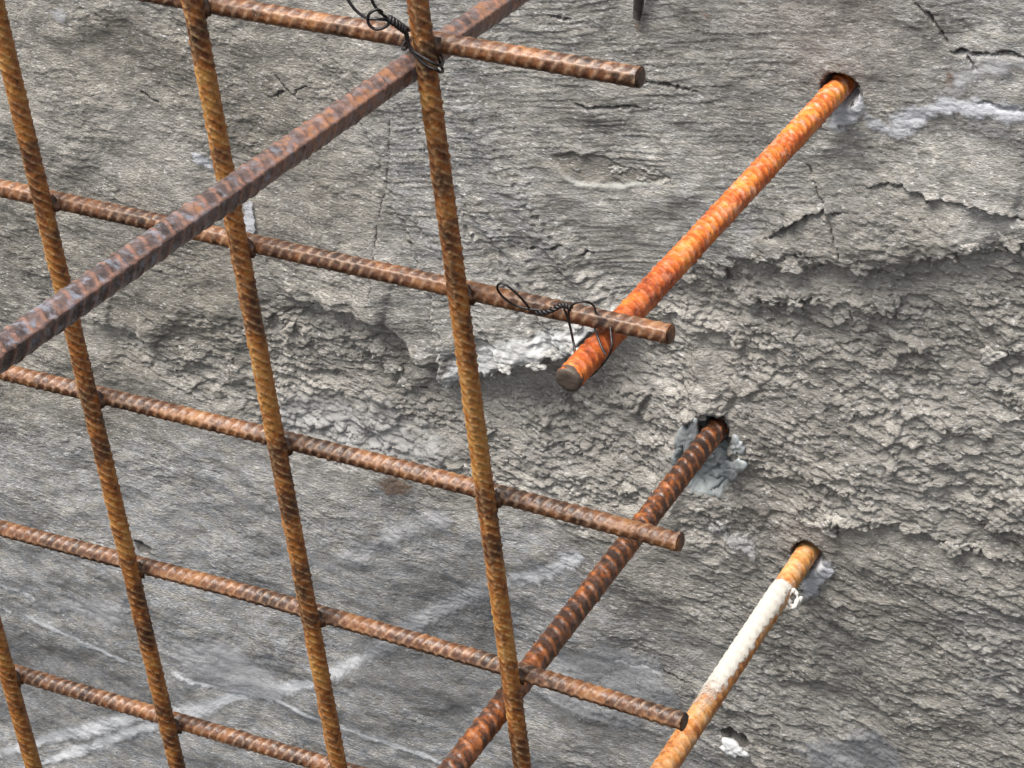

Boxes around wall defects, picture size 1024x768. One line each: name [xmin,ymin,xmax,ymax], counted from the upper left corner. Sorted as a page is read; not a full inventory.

crack [916,3,1020,67]
damp [829,59,1024,138]
crack [763,166,841,258]
spalling [0,0,689,768]
spalling [476,73,1024,768]